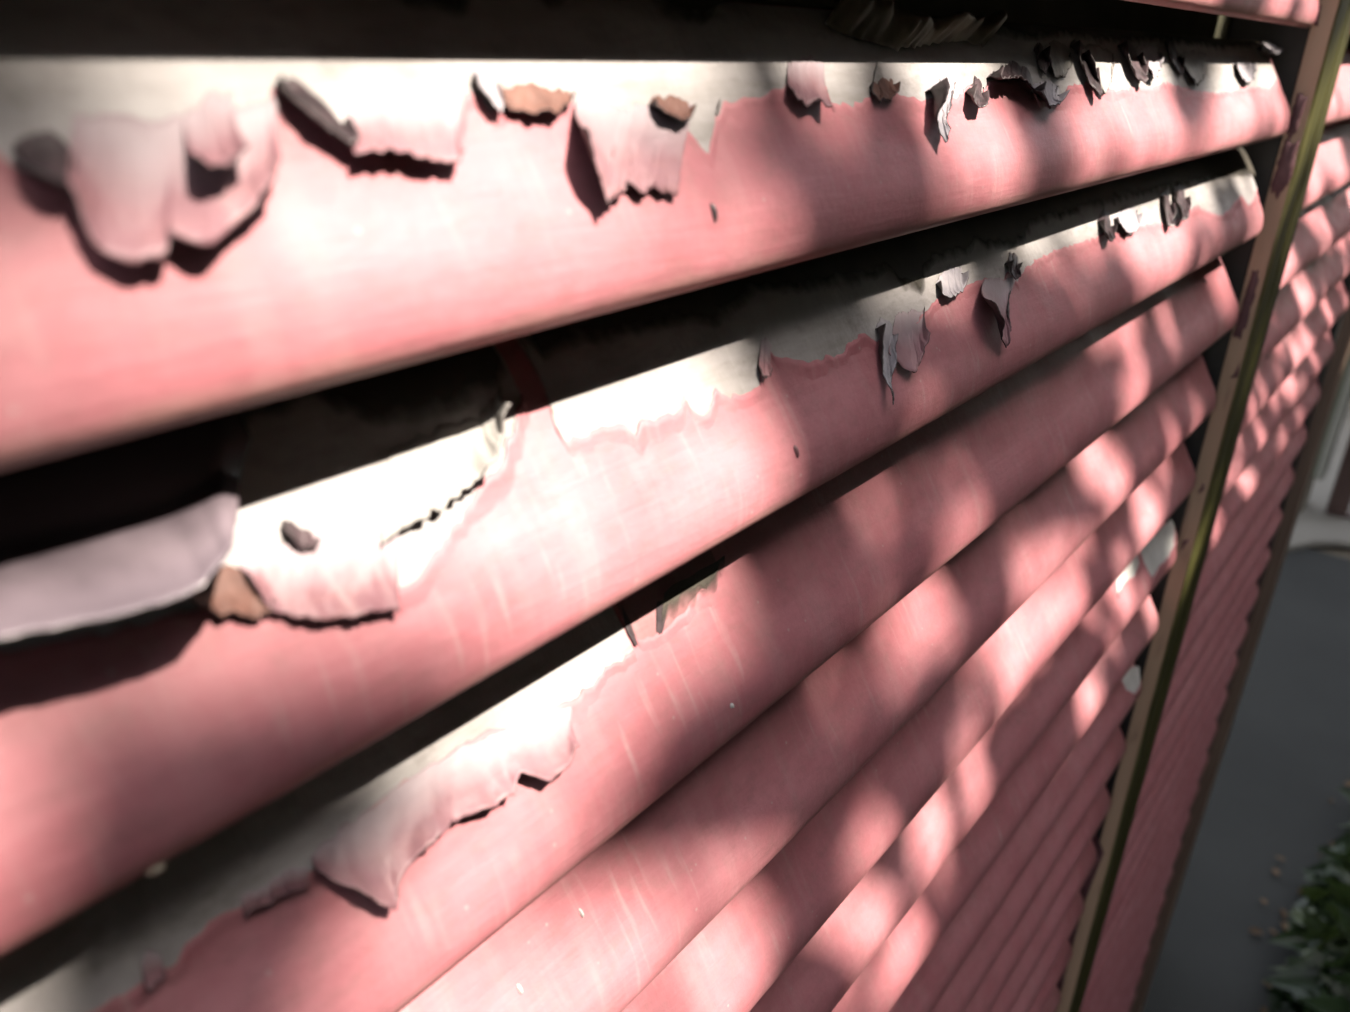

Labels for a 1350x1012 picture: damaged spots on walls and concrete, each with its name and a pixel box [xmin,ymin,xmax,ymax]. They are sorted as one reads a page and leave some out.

peeling [0,0,1283,264]
peeling [515,147,1259,458]
peeling [0,343,529,678]
peeling [0,549,725,1012]
peeling [1122,666,1140,697]
peeling [1116,520,1177,599]